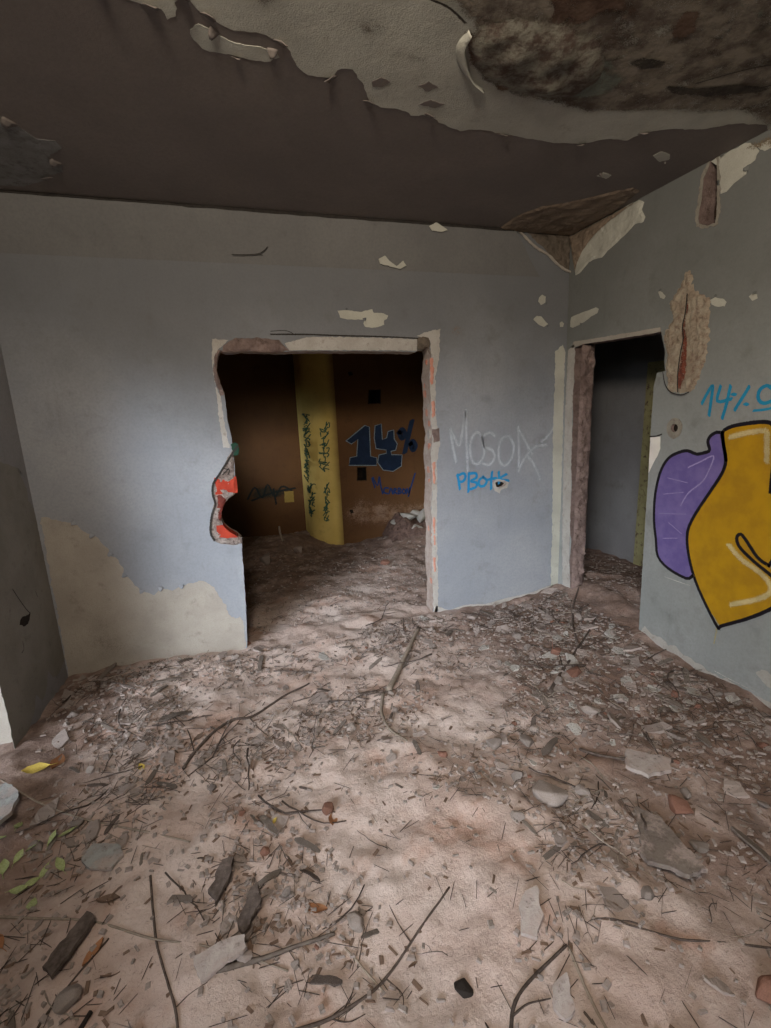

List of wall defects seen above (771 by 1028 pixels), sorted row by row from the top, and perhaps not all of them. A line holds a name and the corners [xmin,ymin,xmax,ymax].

peeling [131,0,771,229]
damp [430,0,771,153]
peeling [429,222,447,232]
spalling [501,188,645,275]
spalling [209,270,726,612]
peeling [0,462,246,749]
peeling [641,626,771,709]